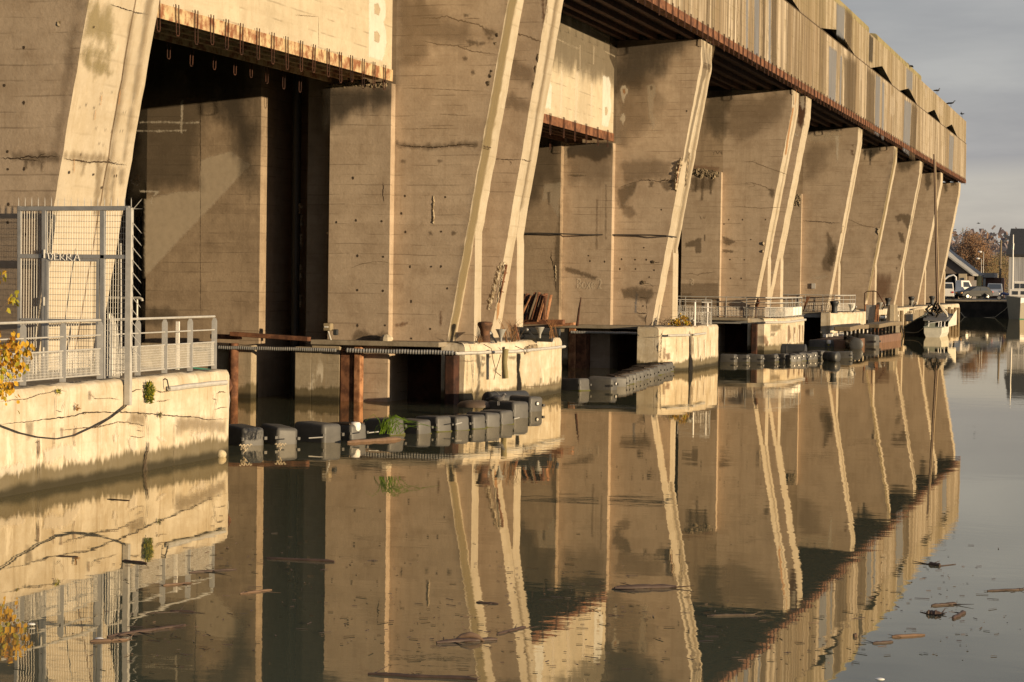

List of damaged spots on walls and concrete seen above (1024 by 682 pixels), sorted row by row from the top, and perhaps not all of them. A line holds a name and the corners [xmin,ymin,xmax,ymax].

leakage [88,5,112,37]
crack [402,88,531,162]
rust [785,90,806,154]
crack [4,154,126,165]
spalling [674,153,720,192]